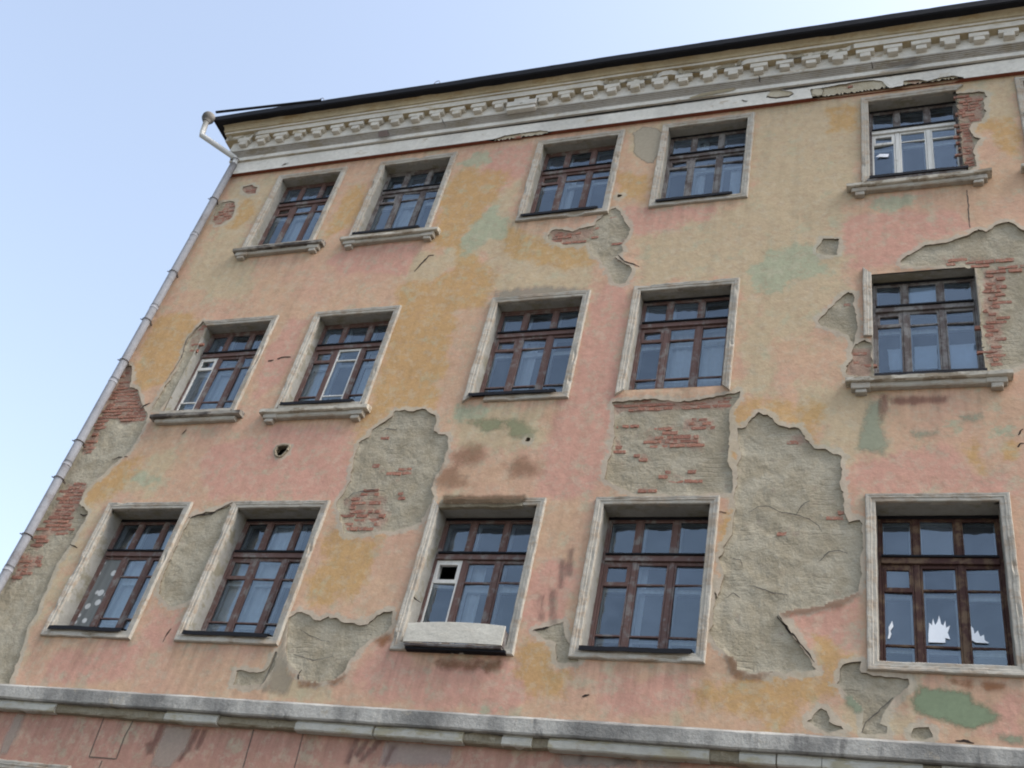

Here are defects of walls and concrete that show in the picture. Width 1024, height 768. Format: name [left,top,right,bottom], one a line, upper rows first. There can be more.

flaking render [953,91,987,170]
flaking render [212,201,235,225]
flaking render [548,194,632,284]
flaking render [818,292,878,377]
flaking render [900,222,1024,370]
flaking render [0,321,210,684]
flaking render [159,505,231,607]
flaking render [336,409,448,535]
flaking render [605,391,863,674]
flaking render [233,611,393,686]
flaking render [534,622,578,664]
flaking render [837,661,998,740]